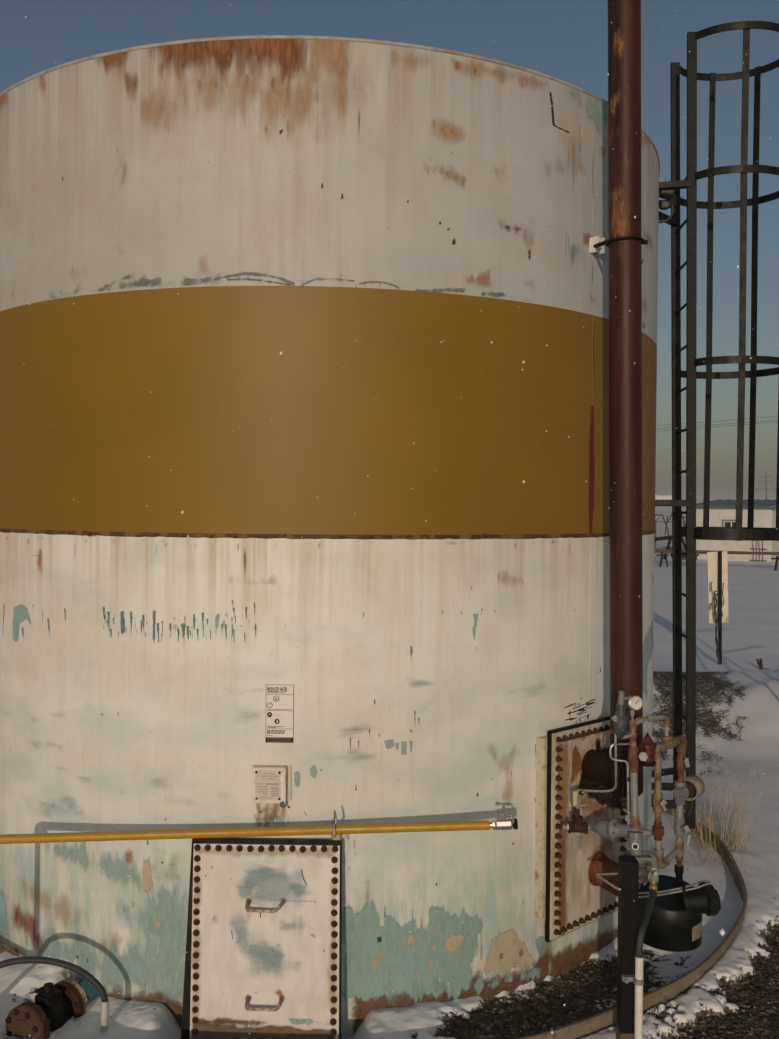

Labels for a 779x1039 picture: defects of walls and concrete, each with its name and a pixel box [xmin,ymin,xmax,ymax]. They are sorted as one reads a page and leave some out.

rust [100,51,128,69]
rust [161,37,346,92]
crack [549,92,570,133]
peeling [3,603,49,642]
peeling [102,600,256,644]
peeling [54,843,87,869]
rust [353,733,618,1025]
peeling [40,856,186,1001]
peeling [342,901,551,1003]